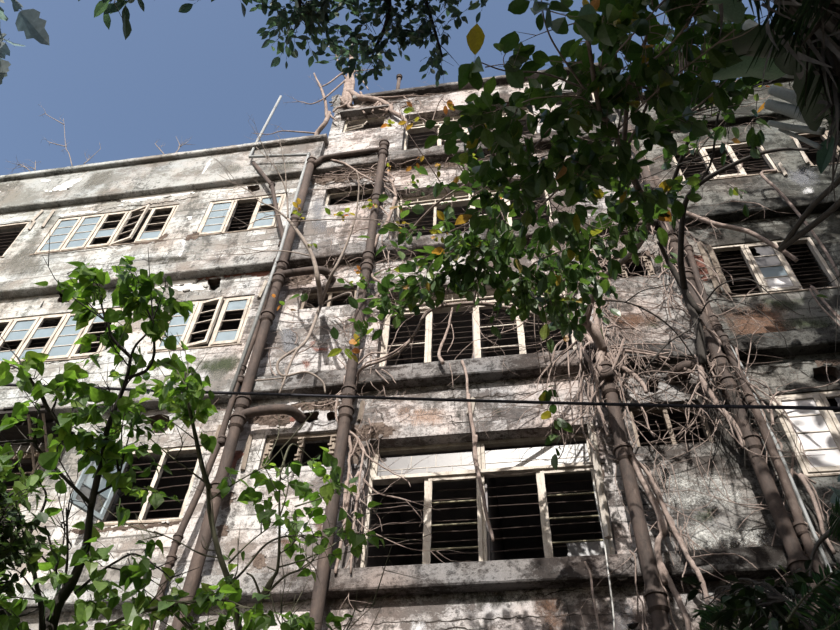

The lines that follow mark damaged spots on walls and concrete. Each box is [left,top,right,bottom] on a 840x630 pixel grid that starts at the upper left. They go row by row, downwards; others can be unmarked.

peeling [41,178,82,192]
spalling [800,360,840,387]
leakage [458,591,512,606]
crack [331,588,645,630]